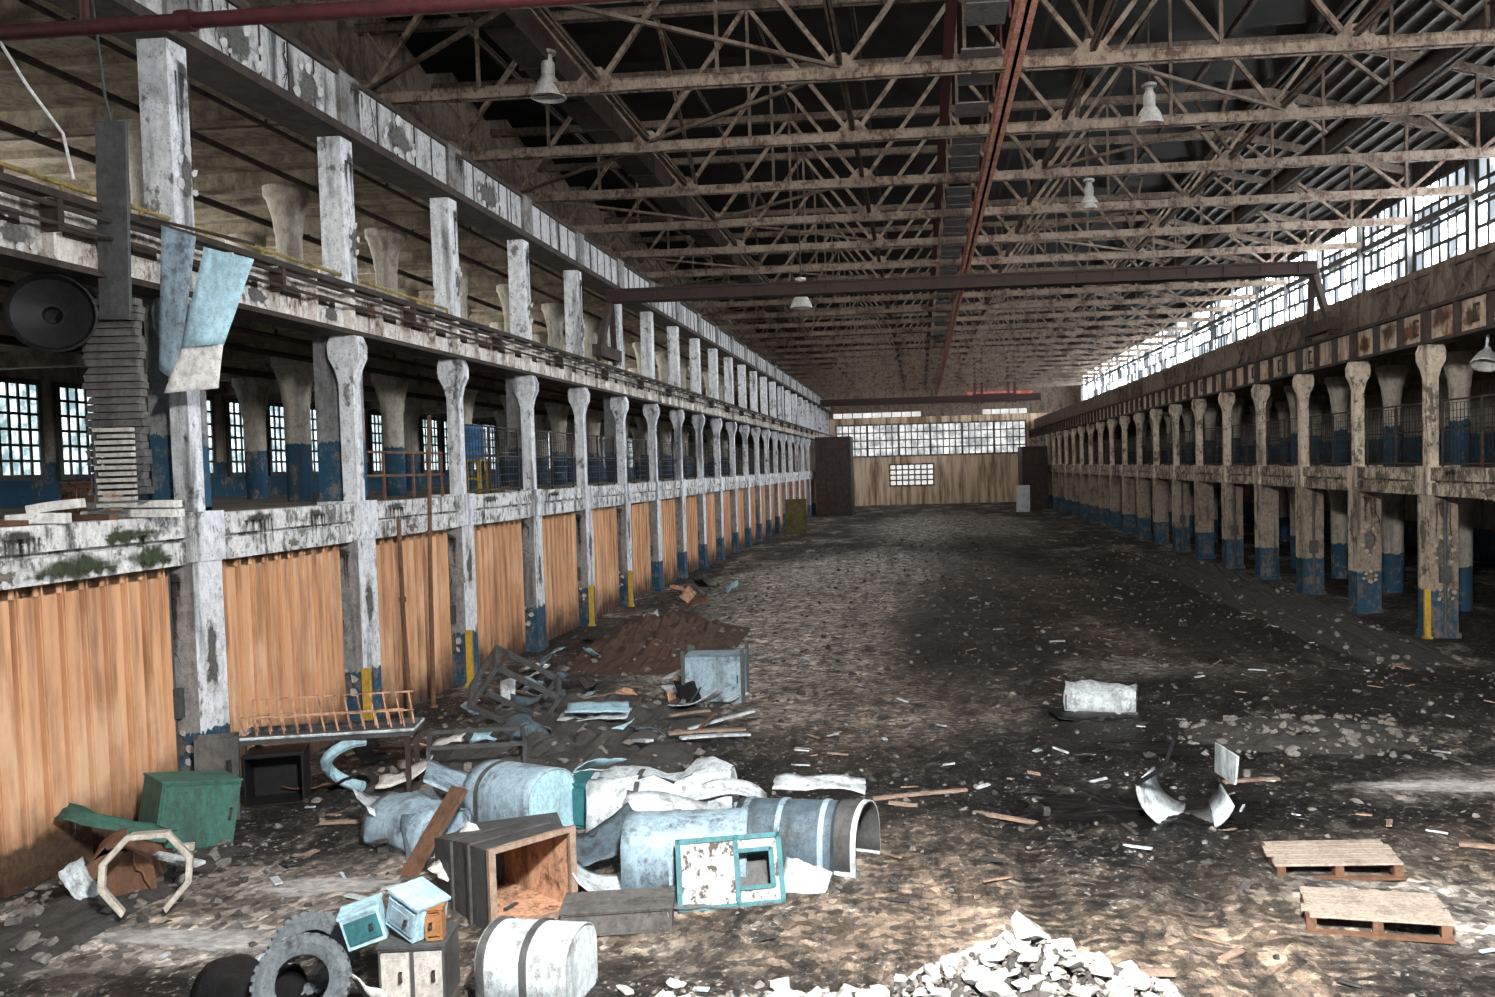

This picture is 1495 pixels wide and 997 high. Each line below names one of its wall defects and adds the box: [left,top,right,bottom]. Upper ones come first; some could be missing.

peeling [219,6,263,73]
peeling [293,62,324,111]
peeling [383,115,416,161]
peeling [177,144,199,206]
peeling [477,178,503,211]
peeling [0,215,40,251]
peeling [347,223,360,265]
peeling [320,302,342,325]
spalling [0,565,22,590]
leakage [4,532,117,580]
leakage [105,535,181,648]
peeling [204,621,223,696]